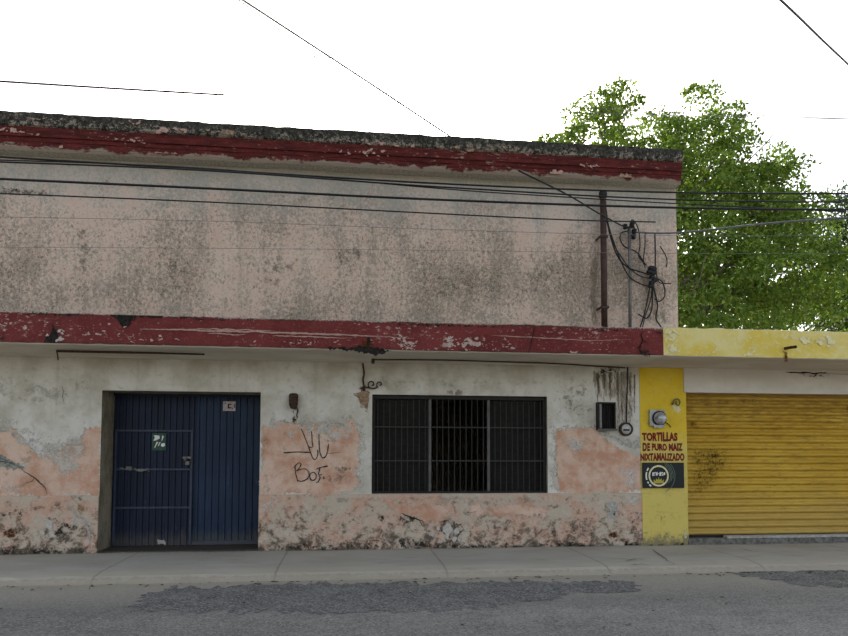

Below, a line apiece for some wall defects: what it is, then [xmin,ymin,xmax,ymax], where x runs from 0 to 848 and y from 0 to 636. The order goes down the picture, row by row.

peeling [120,120,187,134]
peeling [337,138,399,157]
spalling [44,323,70,343]
spalling [85,315,164,345]
spalling [328,337,389,356]
peeling [391,333,483,351]
crack [0,454,47,492]
peeling [0,425,101,496]
peeling [258,412,367,495]
peeling [550,425,641,520]
leakage [273,538,385,551]
leakage [394,518,493,549]